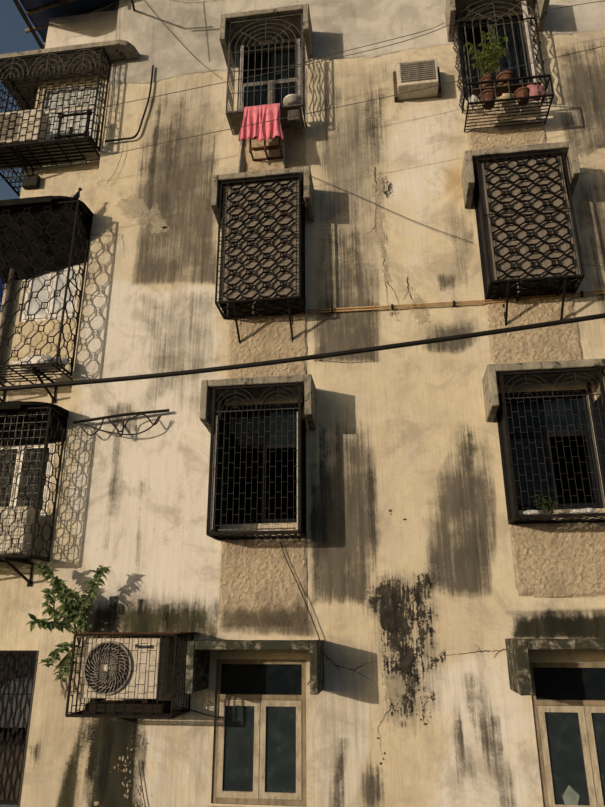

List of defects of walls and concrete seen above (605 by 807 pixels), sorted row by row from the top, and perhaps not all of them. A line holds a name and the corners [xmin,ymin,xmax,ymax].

leakage [135,101,215,284]
leakage [324,95,382,218]
leakage [314,232,401,362]
crack [370,167,416,308]
leakage [562,50,605,153]
leakage [579,186,605,304]
leakage [311,426,495,726]
crack [438,645,506,657]
leakage [85,718,148,807]